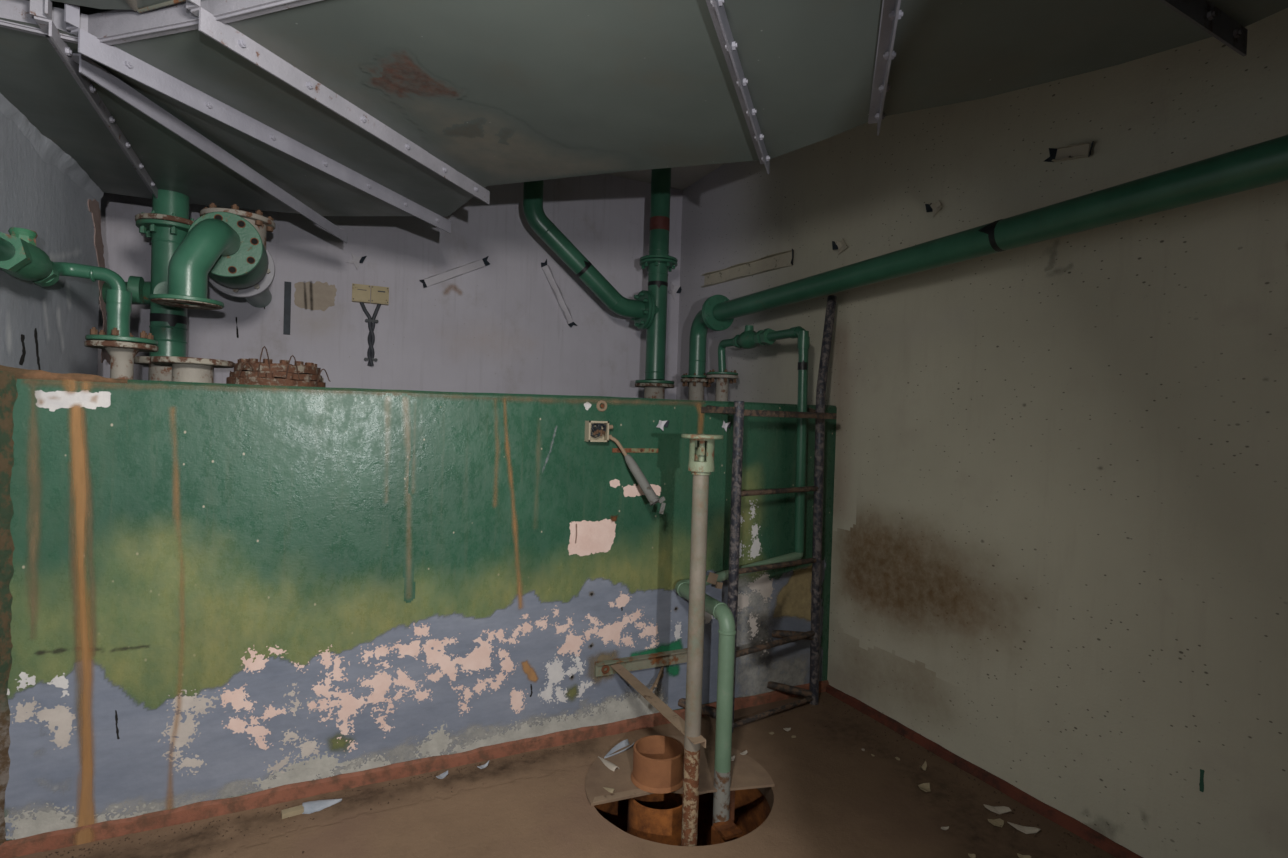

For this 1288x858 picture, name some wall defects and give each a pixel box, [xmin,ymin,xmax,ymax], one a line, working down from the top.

corrosion [26,379,147,845]
peeling [4,578,689,840]
peeling [568,516,617,556]
peeling [702,500,826,704]
water stain [825,310,1063,746]